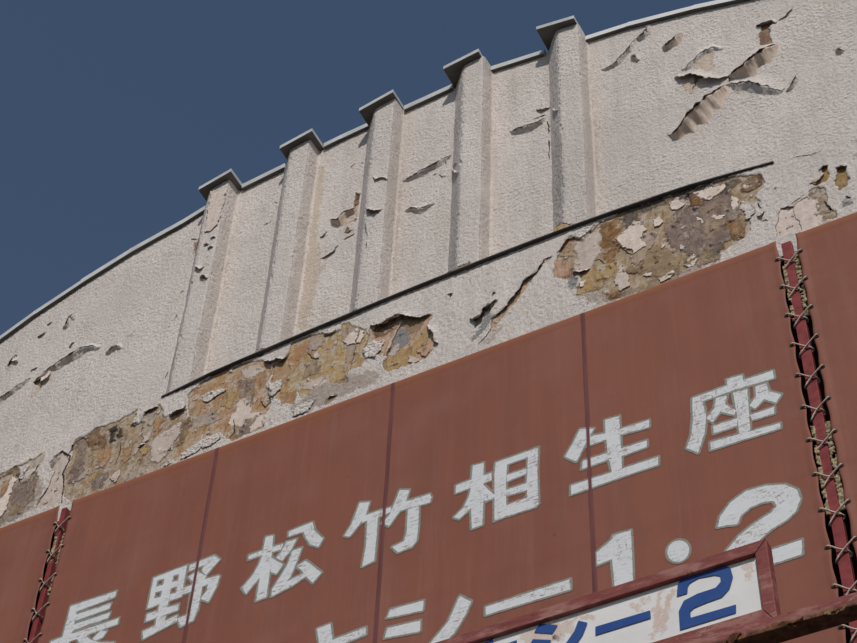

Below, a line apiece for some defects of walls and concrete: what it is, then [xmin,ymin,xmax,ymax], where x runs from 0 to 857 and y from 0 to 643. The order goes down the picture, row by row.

peeling [666,19,786,140]
spalling [320,194,382,246]
peeling [470,174,765,343]
peeling [776,165,850,236]
peeling [0,312,439,527]